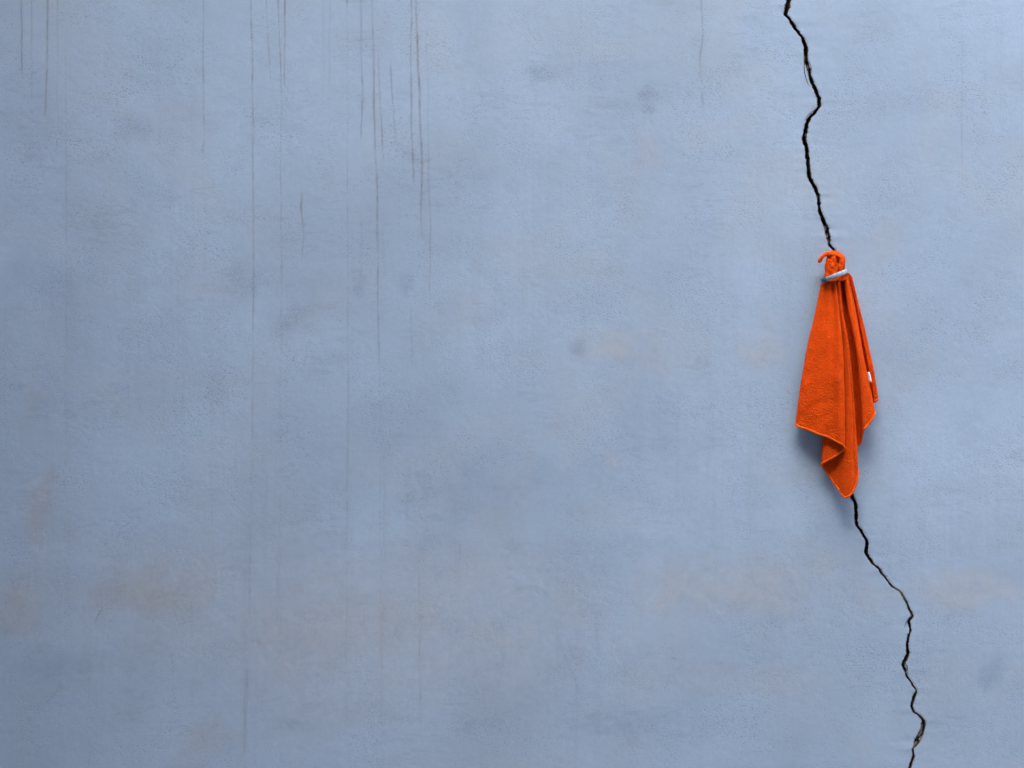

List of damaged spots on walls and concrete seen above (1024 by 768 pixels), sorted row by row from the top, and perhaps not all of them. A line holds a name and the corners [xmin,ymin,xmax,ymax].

crack [783,0,836,251]
crack [850,494,926,768]